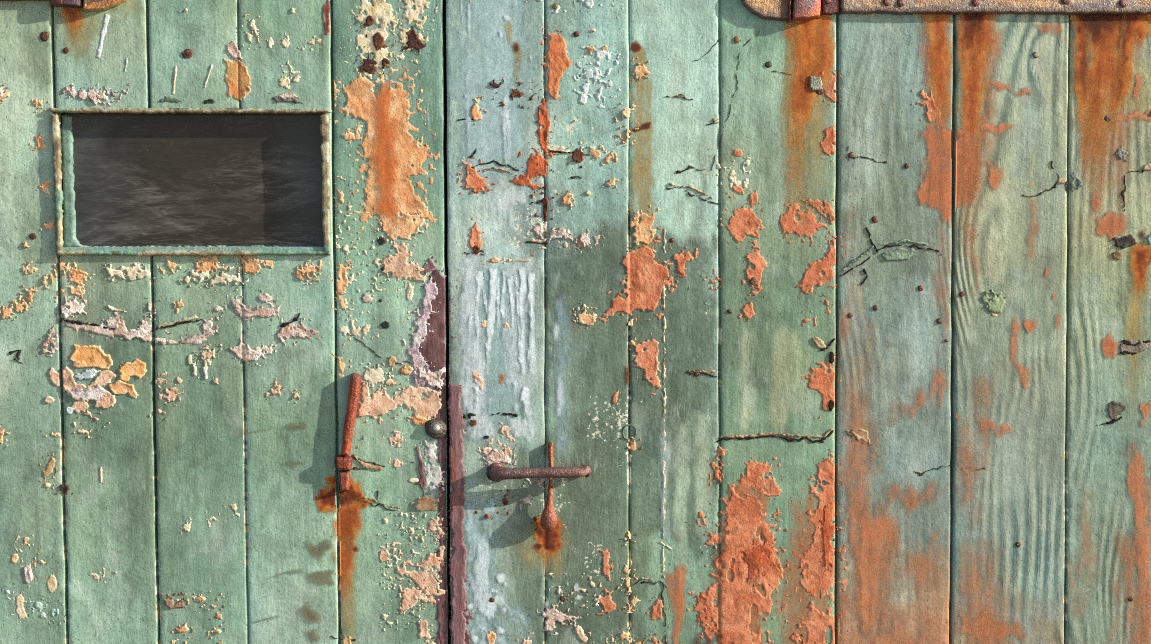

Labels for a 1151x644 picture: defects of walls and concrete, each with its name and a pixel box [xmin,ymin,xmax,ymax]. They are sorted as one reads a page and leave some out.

peeling [465,0,650,274]
rust [782,10,835,212]
rust [919,14,1000,176]
rust [1070,14,1151,184]
peeling [0,242,324,438]
peeling [293,0,519,644]
peeling [573,205,723,397]
peeling [717,149,844,419]
crack [839,227,942,285]
rust [315,475,371,644]
rust [526,516,564,575]
peeling [516,397,934,644]